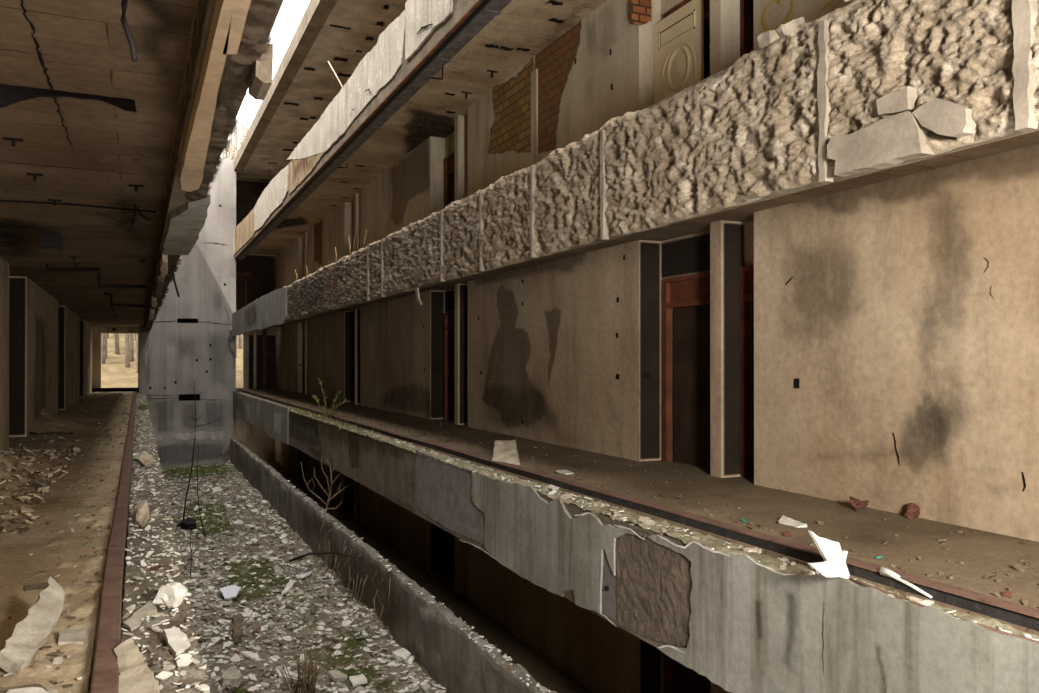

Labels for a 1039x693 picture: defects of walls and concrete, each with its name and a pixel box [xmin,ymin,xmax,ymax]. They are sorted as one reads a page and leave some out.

flaking render [631,0,652,25]
crack [0,0,136,174]
spalling [145,0,207,331]
spalling [187,0,283,201]
flaking render [488,21,581,154]
spalling [230,429,549,693]
peeling [531,485,601,525]
spalling [600,509,731,653]
peeling [743,548,793,575]